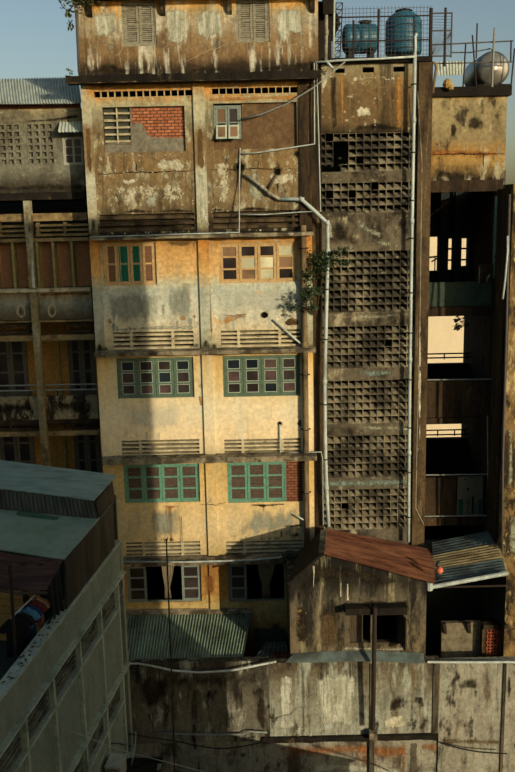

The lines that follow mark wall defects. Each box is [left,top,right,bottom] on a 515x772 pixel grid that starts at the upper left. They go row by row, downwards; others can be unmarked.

peeling [354,103,375,126]
damp [469,101,483,129]
peeling [152,124,207,173]
peeling [97,172,183,213]
peeling [216,162,296,212]
damp [111,295,154,328]
damp [170,290,192,324]
damp [298,566,396,604]
damp [257,688,265,728]